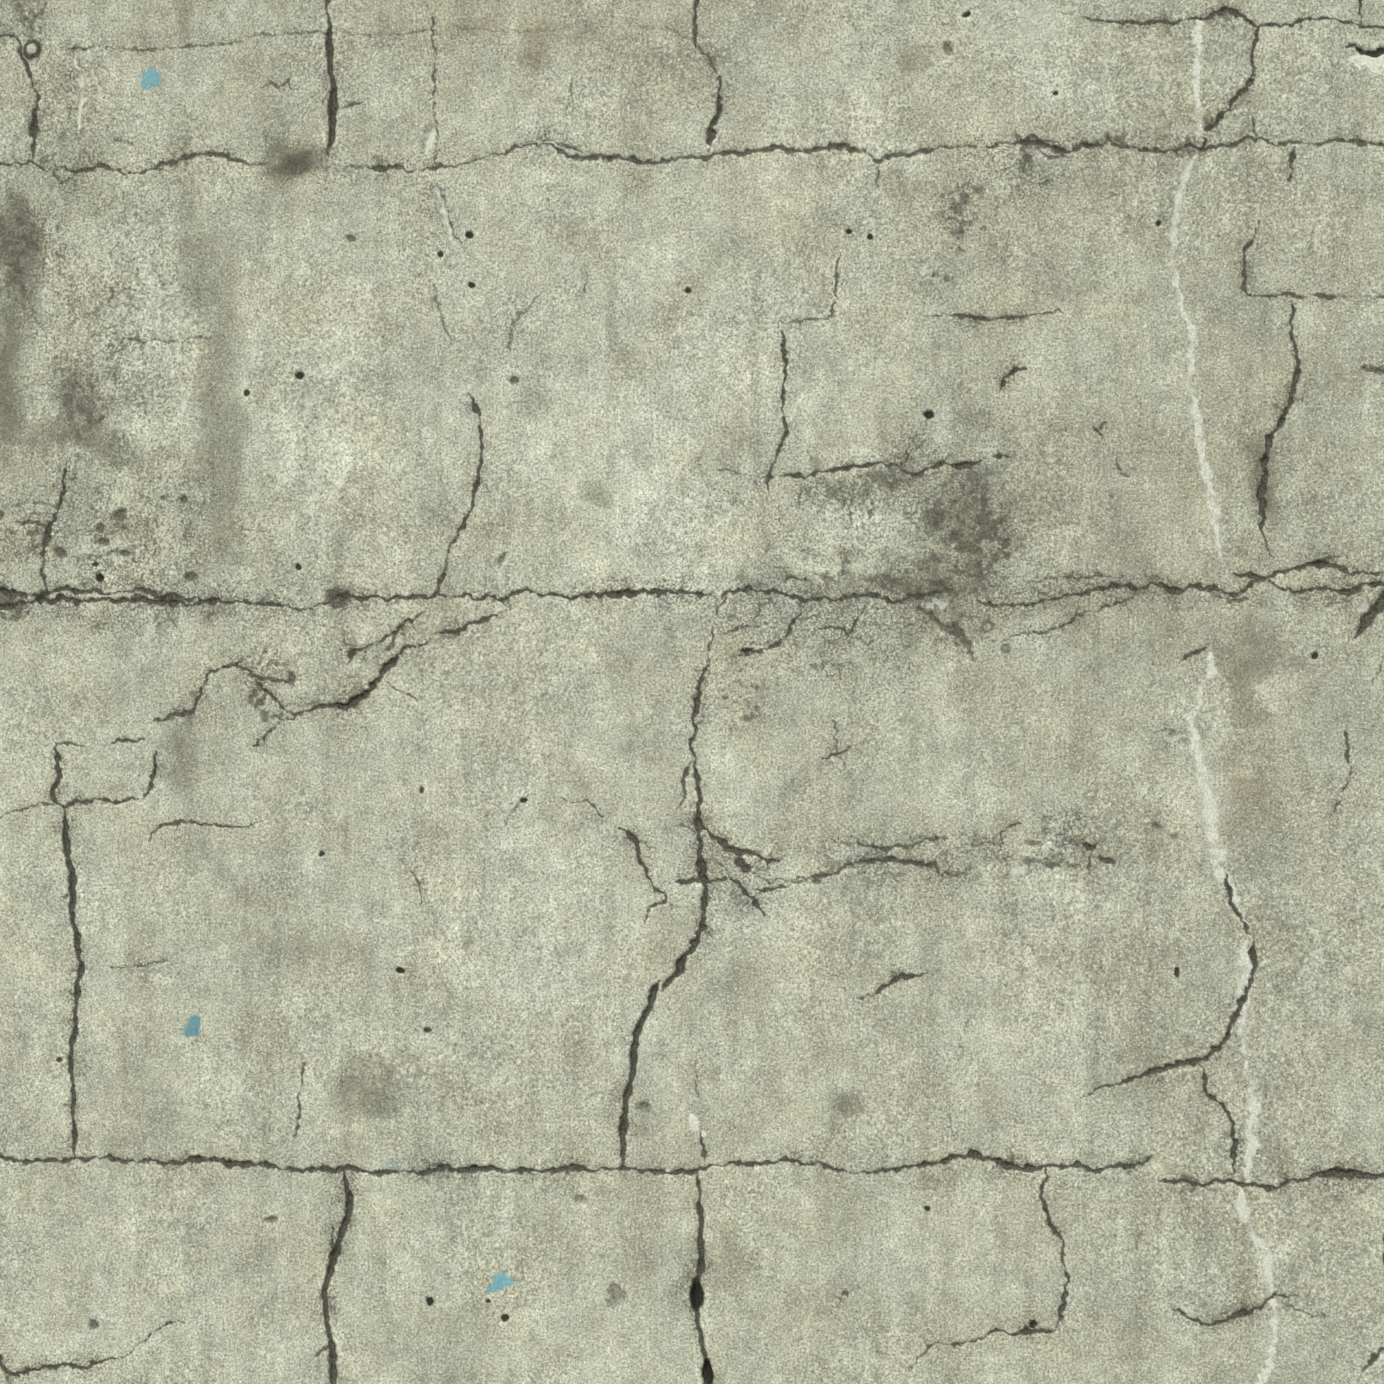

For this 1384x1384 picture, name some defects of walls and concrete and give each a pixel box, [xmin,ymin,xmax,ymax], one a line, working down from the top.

crack [0,34,268,175]
crack [325,0,1384,184]
crack [718,251,1009,493]
crack [932,308,1059,321]
crack [977,221,1384,636]
leakage [1169,19,1223,570]
crack [0,393,1384,1384]
leakage [1186,652,1279,1384]